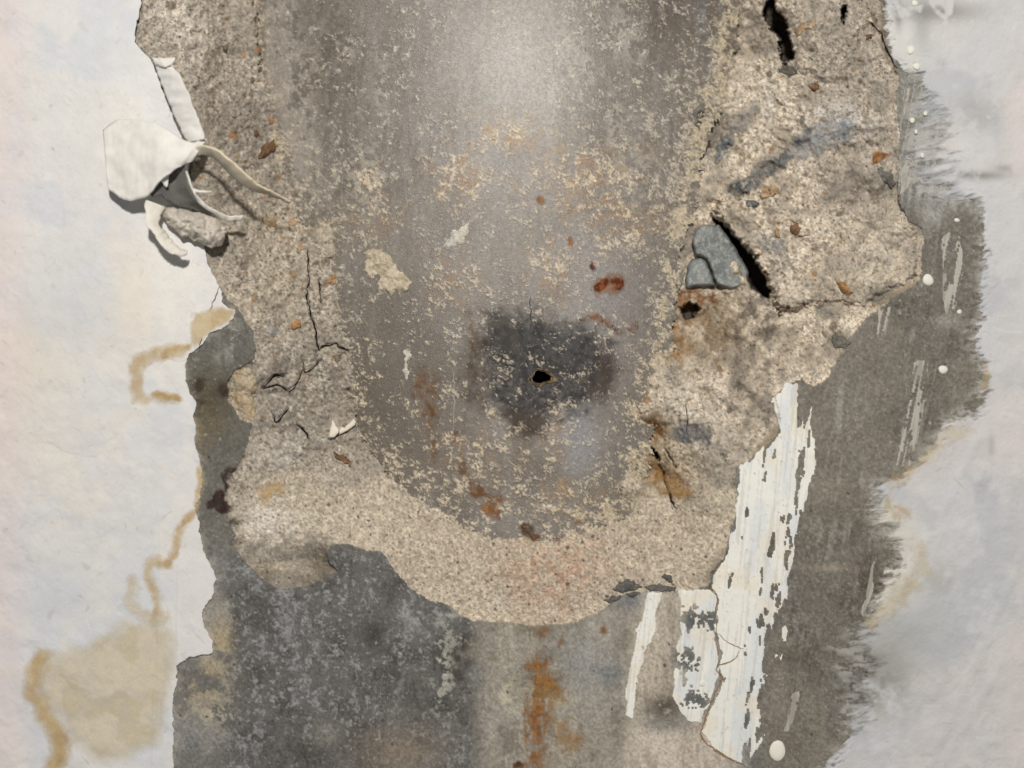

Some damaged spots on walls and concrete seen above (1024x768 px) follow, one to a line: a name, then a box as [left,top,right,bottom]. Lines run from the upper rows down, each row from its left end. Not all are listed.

water stain [131,309,233,401]
crack [262,250,349,439]
spalling [135,0,924,626]
water stain [467,312,613,437]
corrosion [594,276,624,292]
crack [658,450,678,509]
water stain [26,467,239,768]
corrosion [513,659,561,768]